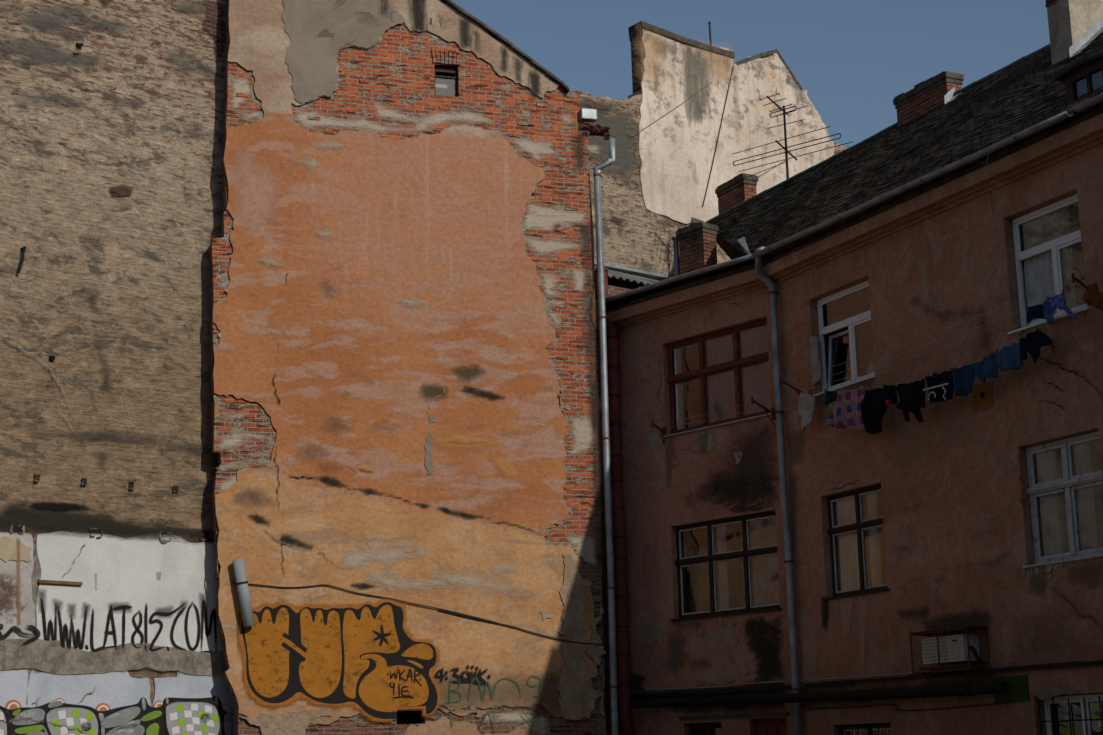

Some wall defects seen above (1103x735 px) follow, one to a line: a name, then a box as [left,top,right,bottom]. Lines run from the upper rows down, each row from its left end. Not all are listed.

damp [412,0,425,29]
damp [461,19,478,46]
flaking render [226,62,264,128]
damp [502,48,540,95]
damp [654,39,729,120]
flaking render [291,23,606,735]
crack [1027,336,1101,412]
flaking render [214,392,276,494]
damp [701,429,771,498]